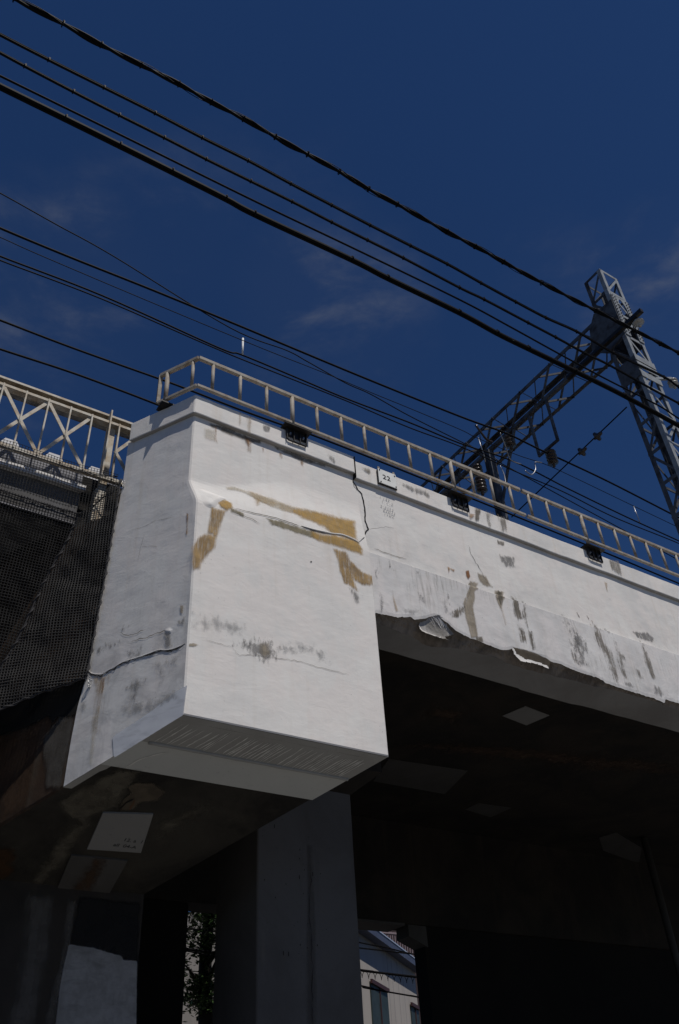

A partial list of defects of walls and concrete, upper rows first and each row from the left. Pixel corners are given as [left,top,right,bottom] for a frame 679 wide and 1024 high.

crack [232,477,405,559]
crack [89,630,185,677]
water stain [244,641,280,659]
water stain [454,574,534,650]
spalling [375,613,679,709]
water stain [594,626,662,696]